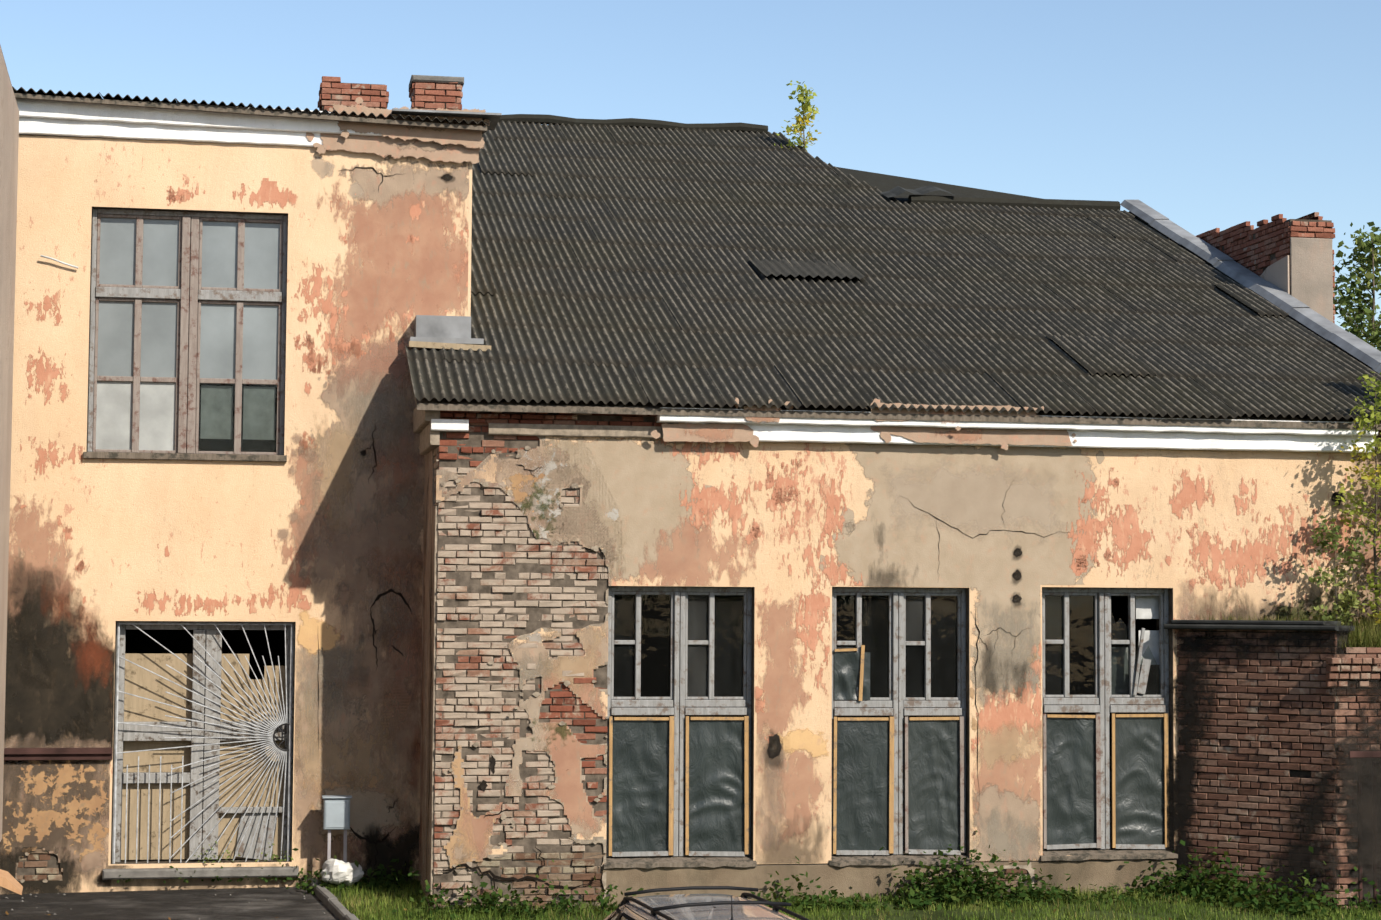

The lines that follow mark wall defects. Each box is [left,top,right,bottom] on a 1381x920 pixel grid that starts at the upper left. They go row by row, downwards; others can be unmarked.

peeling [25,348,72,406]
peeling [7,498,90,624]
peeling [20,435,83,479]
crack [370,478,432,710]
flaking render [122,97,1171,910]
crack [901,480,1079,580]
peeling [1169,453,1381,617]
leakage [0,847,78,894]
leakage [3,574,115,796]
peeling [0,741,124,885]
leakage [159,878,240,889]
leakage [1163,587,1381,904]